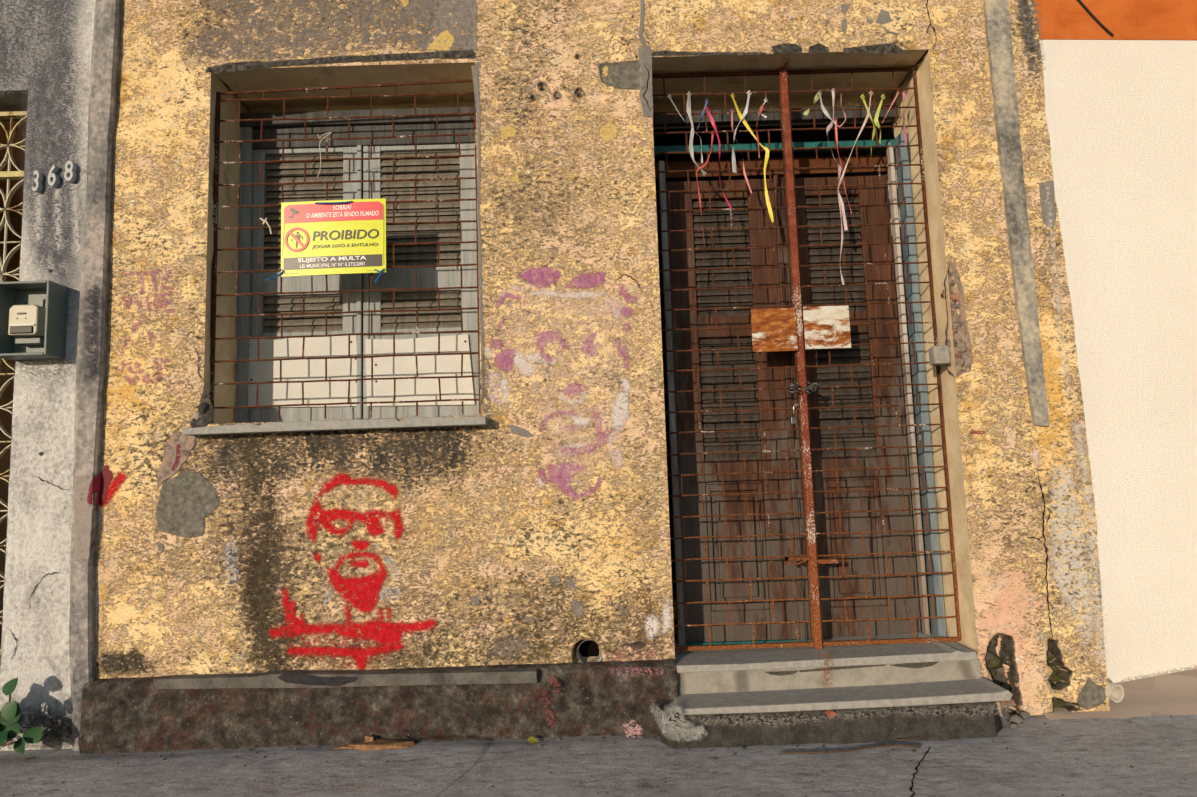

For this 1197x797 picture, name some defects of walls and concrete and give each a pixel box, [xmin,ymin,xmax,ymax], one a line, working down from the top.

flaking render [185,0,492,420]
spalling [929,261,973,377]
water stain [193,426,482,672]
crack [1027,470,1053,639]
water stain [445,579,614,664]
spalling [977,633,1023,716]
spalling [1046,639,1082,712]